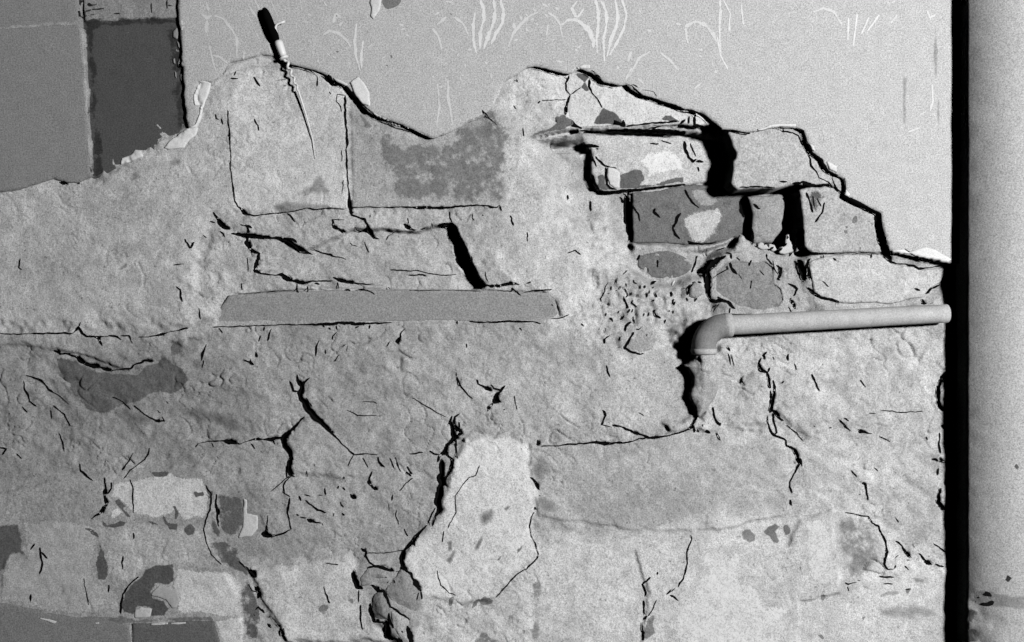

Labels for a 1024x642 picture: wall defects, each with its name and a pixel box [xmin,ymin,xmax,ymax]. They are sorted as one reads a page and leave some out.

flaking render [334,77,424,136]
peeling [594,108,623,125]
water stain [381,112,509,201]
peeling [598,167,683,190]
crack [482,67,947,315]
hole [599,270,703,343]
crack [0,57,528,642]
crack [537,407,721,447]
crack [728,347,948,511]
peeling [0,525,24,571]
crack [845,467,945,590]
peeling [122,564,180,618]